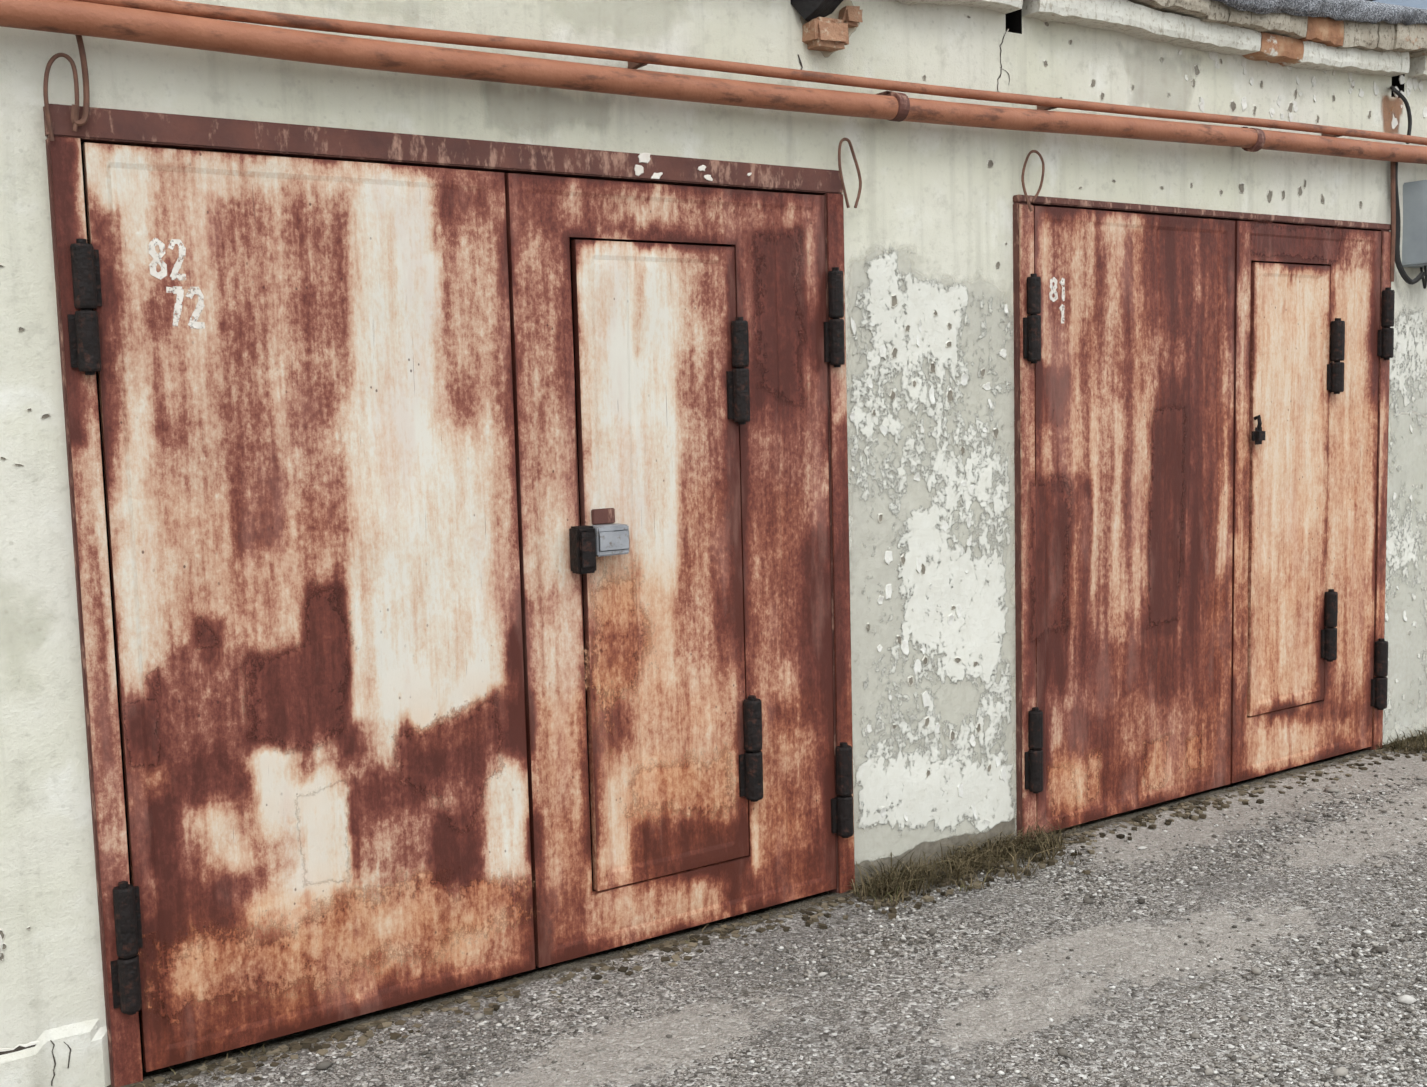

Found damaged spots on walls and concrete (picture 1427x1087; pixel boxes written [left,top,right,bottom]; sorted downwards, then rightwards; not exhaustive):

flaking render [797,0,863,70]
peeling [846,244,1074,886]
peeling [1383,305,1427,732]
rust [580,556,654,753]
rust [625,743,737,832]
rust [1046,748,1102,822]
rust [1143,730,1204,792]
rust [138,866,530,1025]